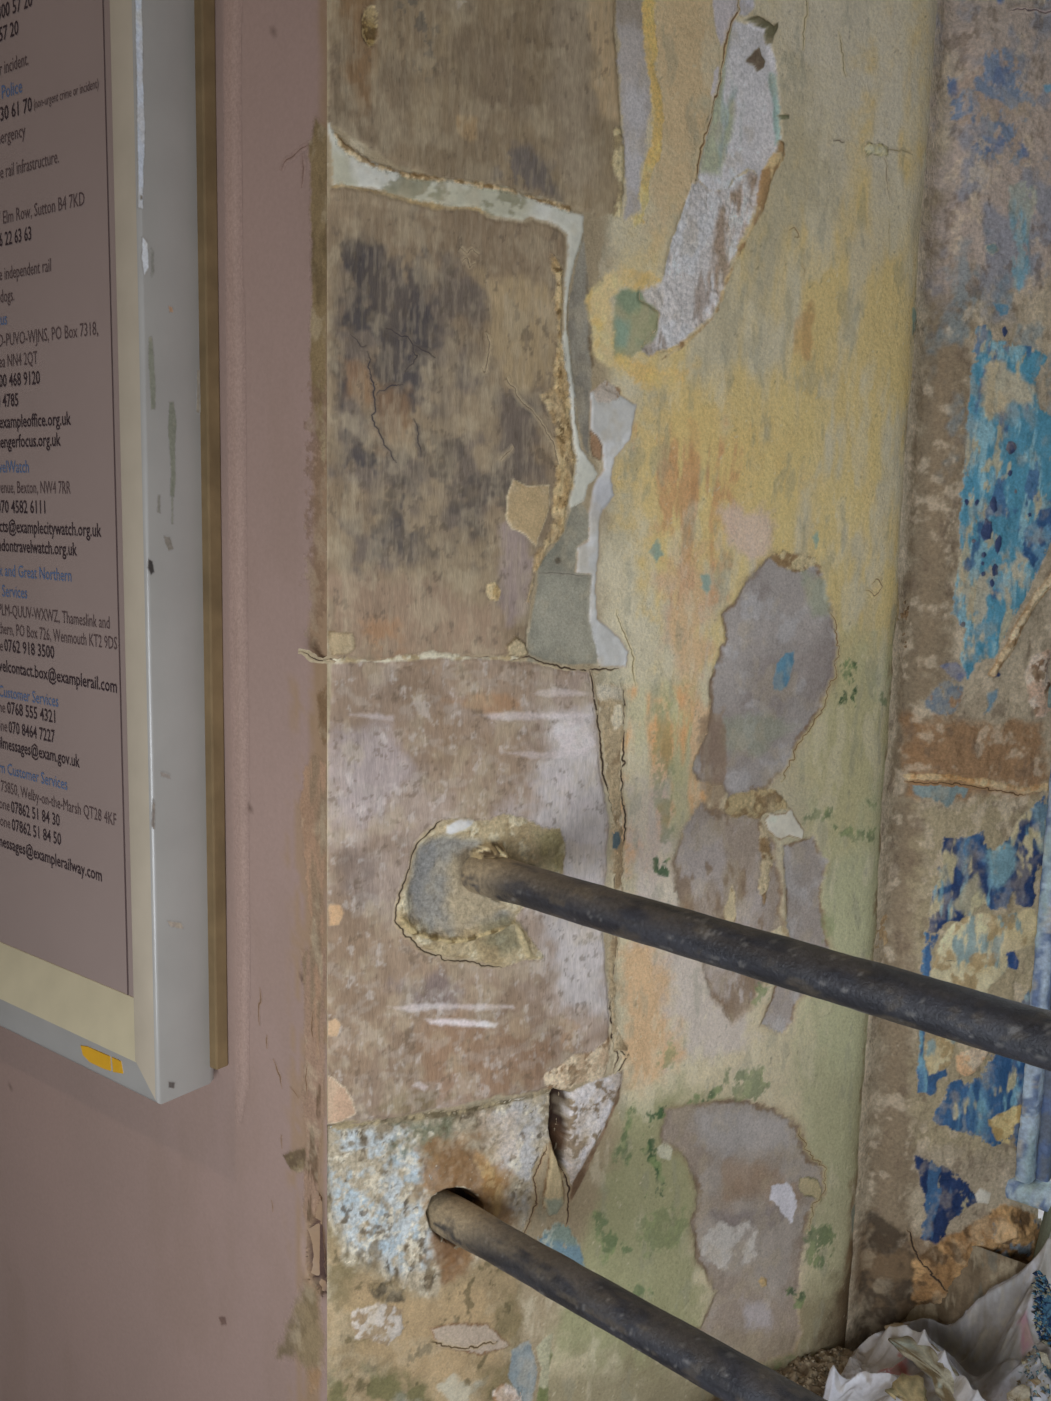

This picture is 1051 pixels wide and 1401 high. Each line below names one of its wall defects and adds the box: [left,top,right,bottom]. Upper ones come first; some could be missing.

peeling [639,0,790,362]
peeling [945,44,1051,169]
crack [538,569,589,578]
peeling [949,324,1051,681]
flaking render [257,0,666,1401]
crack [298,609,639,892]
spalling [1023,649,1051,721]
peeling [919,793,1049,994]
crack [606,934,630,1074]
peeling [915,1030,1025,1154]
corrosion [405,1124,525,1292]